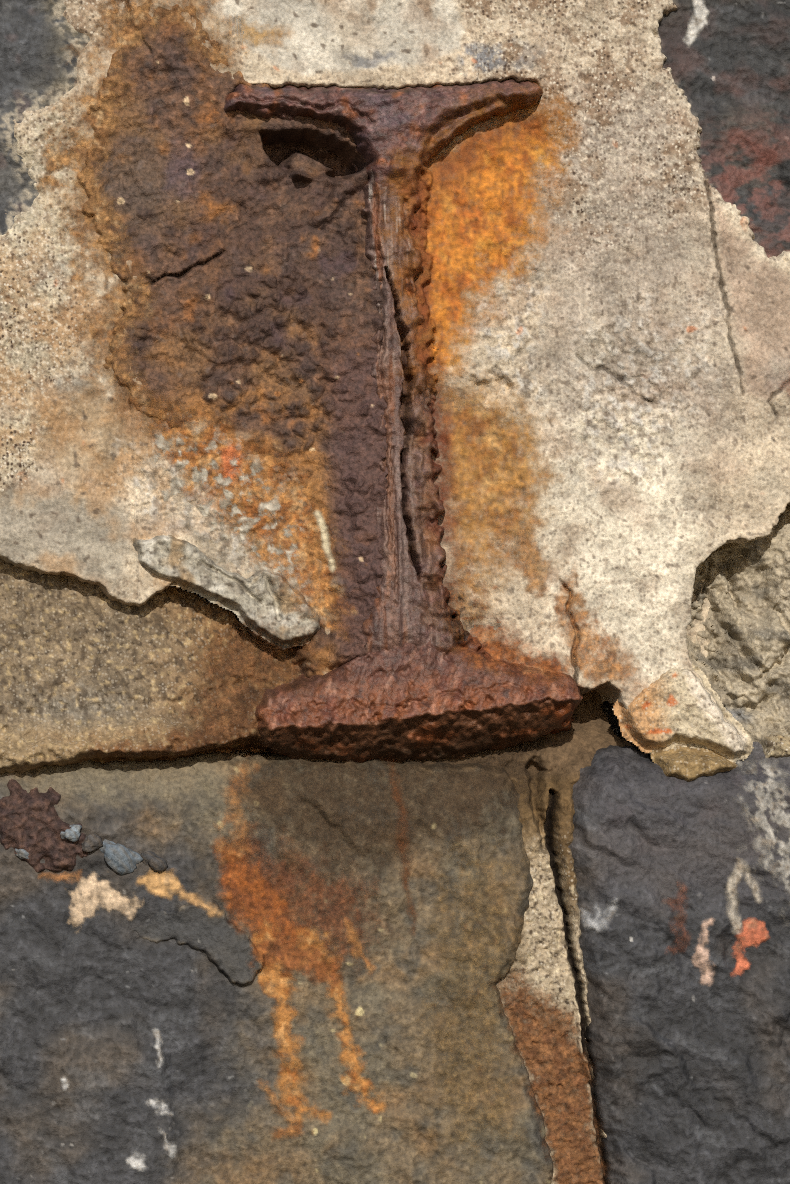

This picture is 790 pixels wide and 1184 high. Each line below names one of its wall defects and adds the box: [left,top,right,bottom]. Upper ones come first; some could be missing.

corrosion [40,0,634,751]
spalling [0,535,321,774]
spalling [686,506,790,758]
corrosion [215,840,384,1137]
corrosion [499,977,606,1184]
crack [544,790,606,1184]